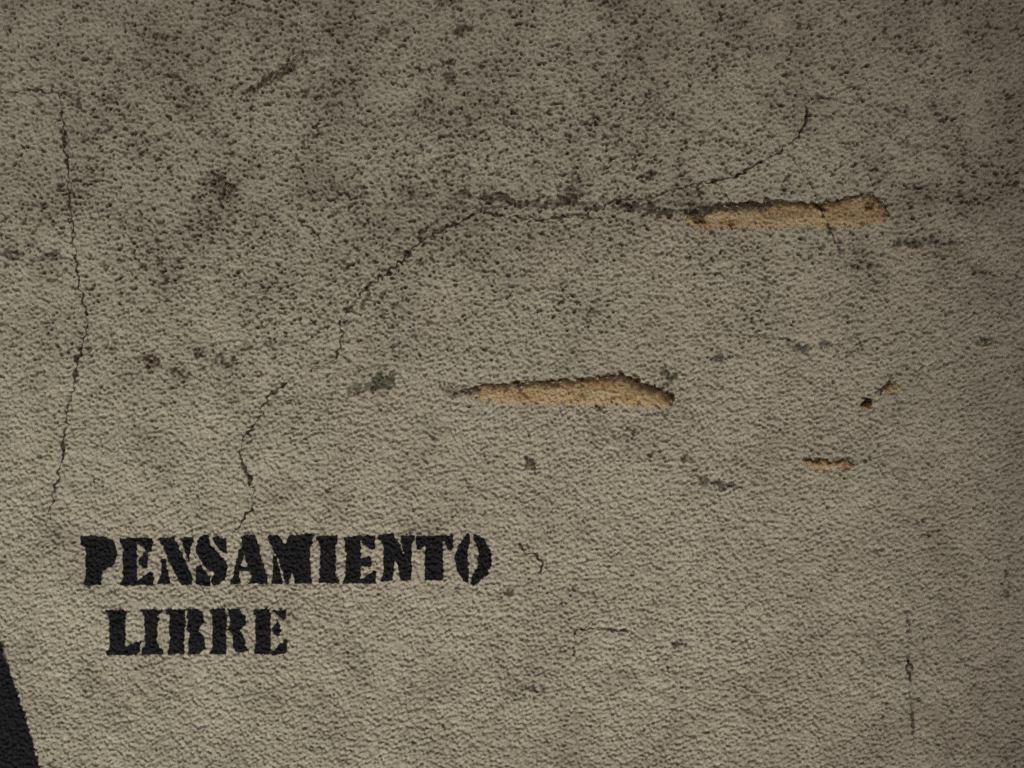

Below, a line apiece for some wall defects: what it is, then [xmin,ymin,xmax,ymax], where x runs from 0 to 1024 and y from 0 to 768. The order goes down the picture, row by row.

flaking render [684,192,890,234]
crack [0,88,98,518]
crack [234,81,908,532]
flaking render [445,372,675,410]
flaking render [803,457,853,473]